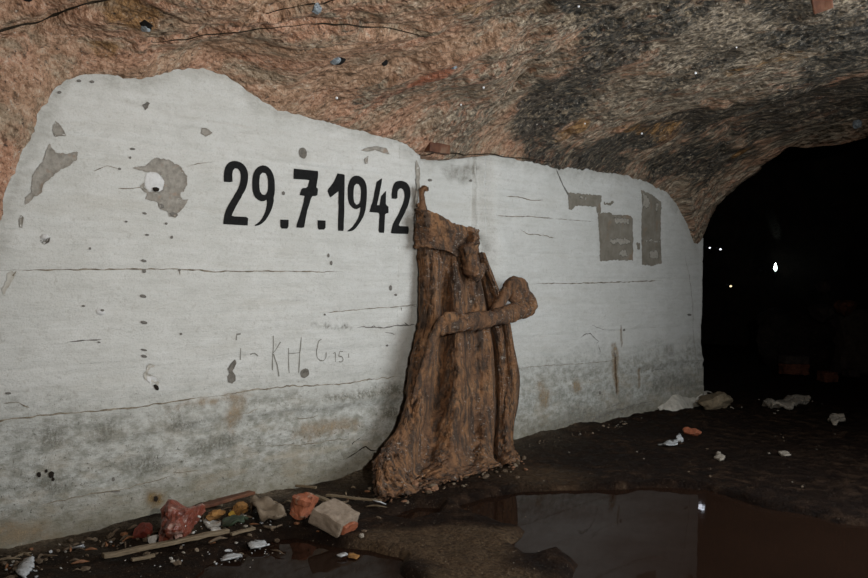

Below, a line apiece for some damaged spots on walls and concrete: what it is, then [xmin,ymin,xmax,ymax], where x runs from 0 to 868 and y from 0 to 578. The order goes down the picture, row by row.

flaking render [25,121,78,205]
flaking render [129,148,188,225]